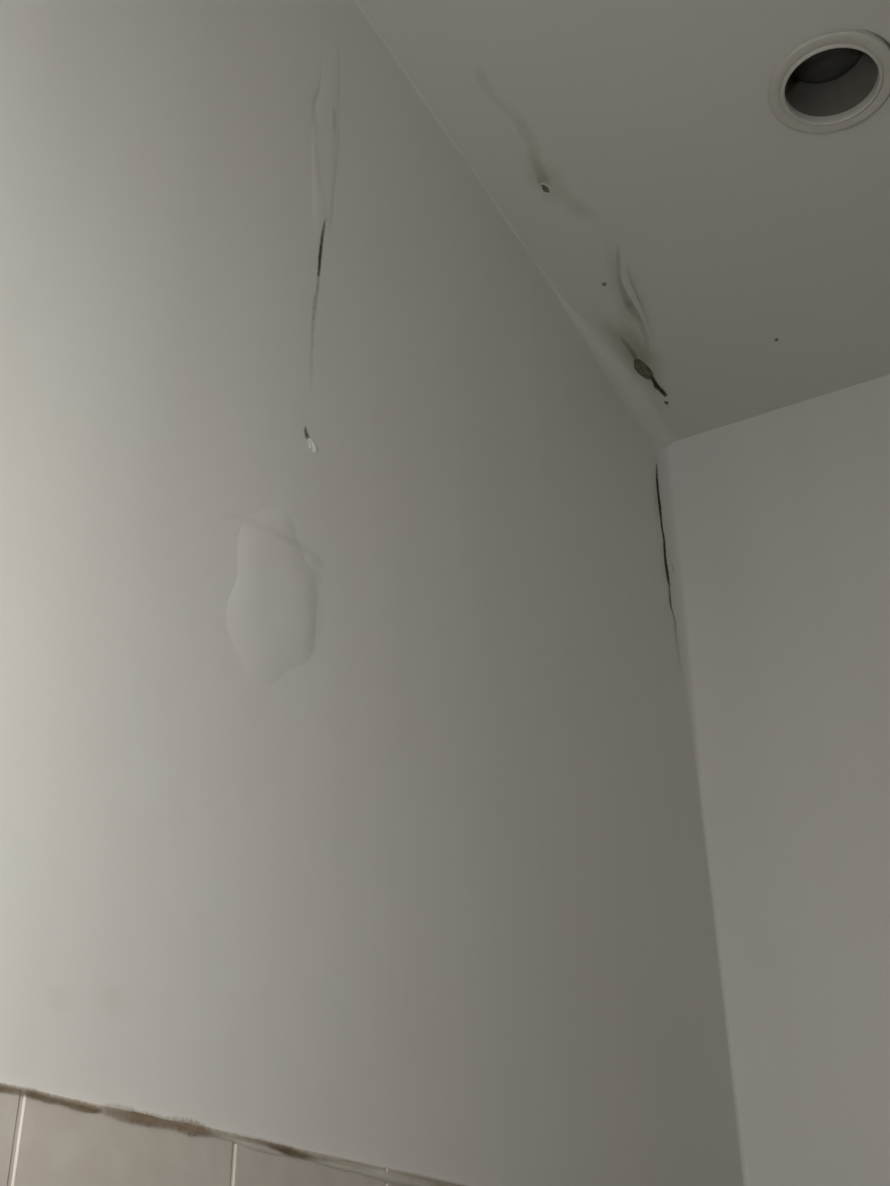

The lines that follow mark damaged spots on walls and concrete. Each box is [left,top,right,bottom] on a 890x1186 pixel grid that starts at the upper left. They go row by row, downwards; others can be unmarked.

crack [317,230,325,274]
crack [633,359,668,404]
crack [653,464,674,616]